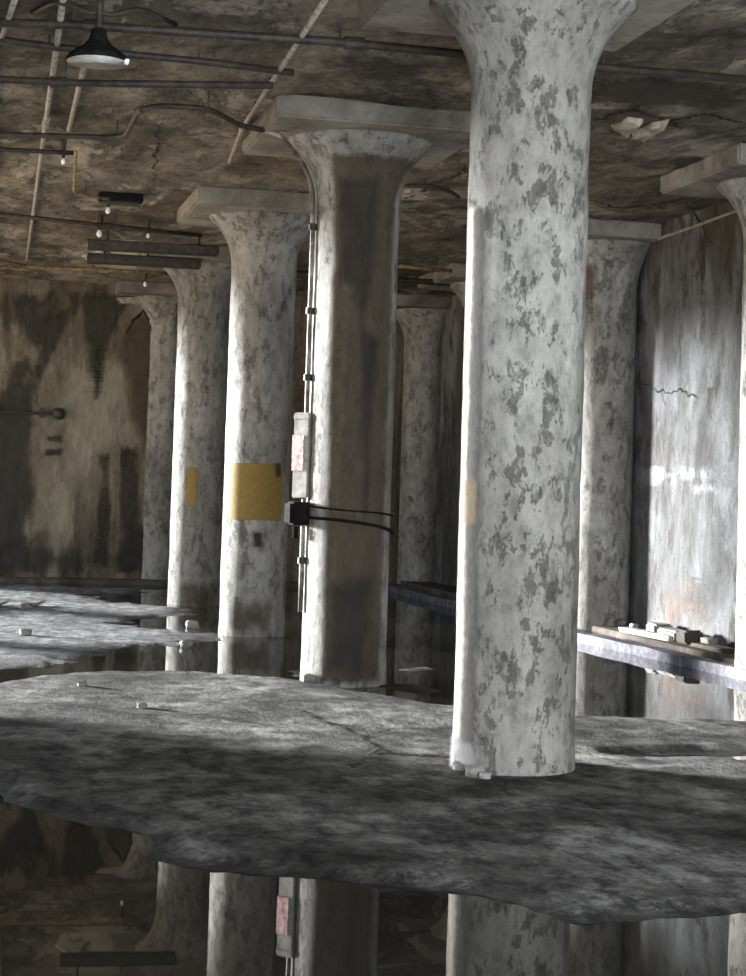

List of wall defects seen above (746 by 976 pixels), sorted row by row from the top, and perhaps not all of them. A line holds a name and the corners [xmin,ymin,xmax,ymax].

damp [0,292,151,577]